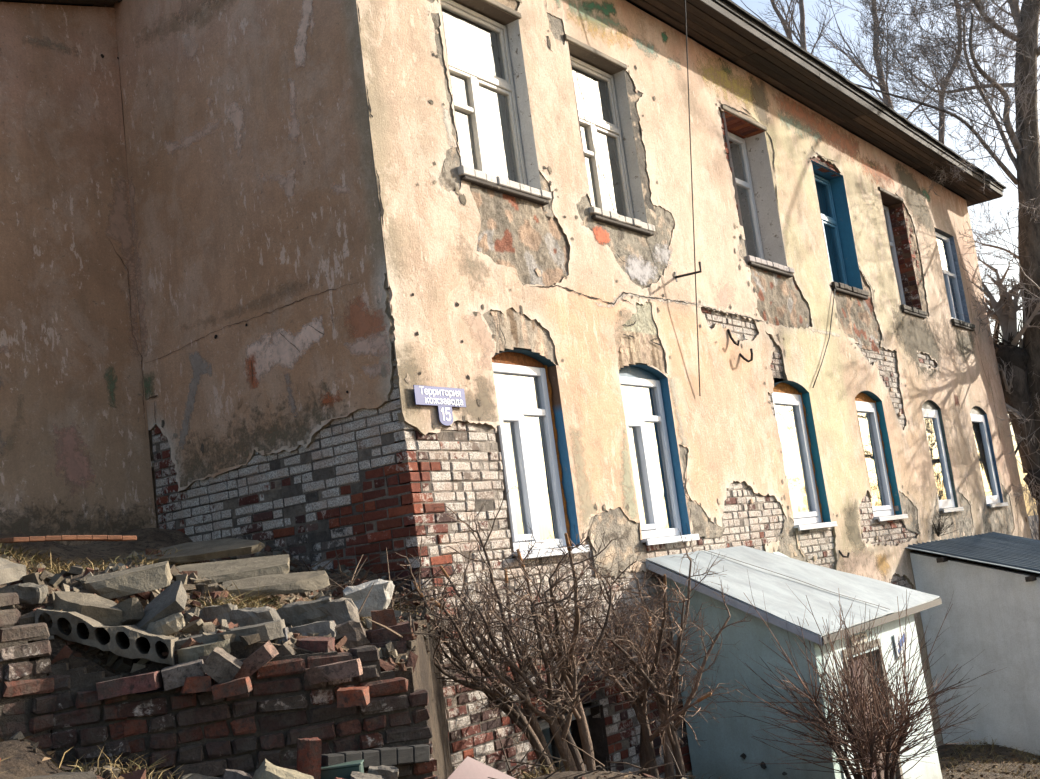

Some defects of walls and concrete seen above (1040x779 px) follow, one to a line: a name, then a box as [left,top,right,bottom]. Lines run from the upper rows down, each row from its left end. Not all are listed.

flaking render [427,0,675,373]
flaking render [716,94,734,186]
crack [107,237,359,435]
crack [529,285,764,367]
flaking render [699,204,810,418]
flaking render [829,273,910,429]
flaking render [900,203,929,330]
flaking render [152,359,838,779]
flaking render [858,485,1014,547]